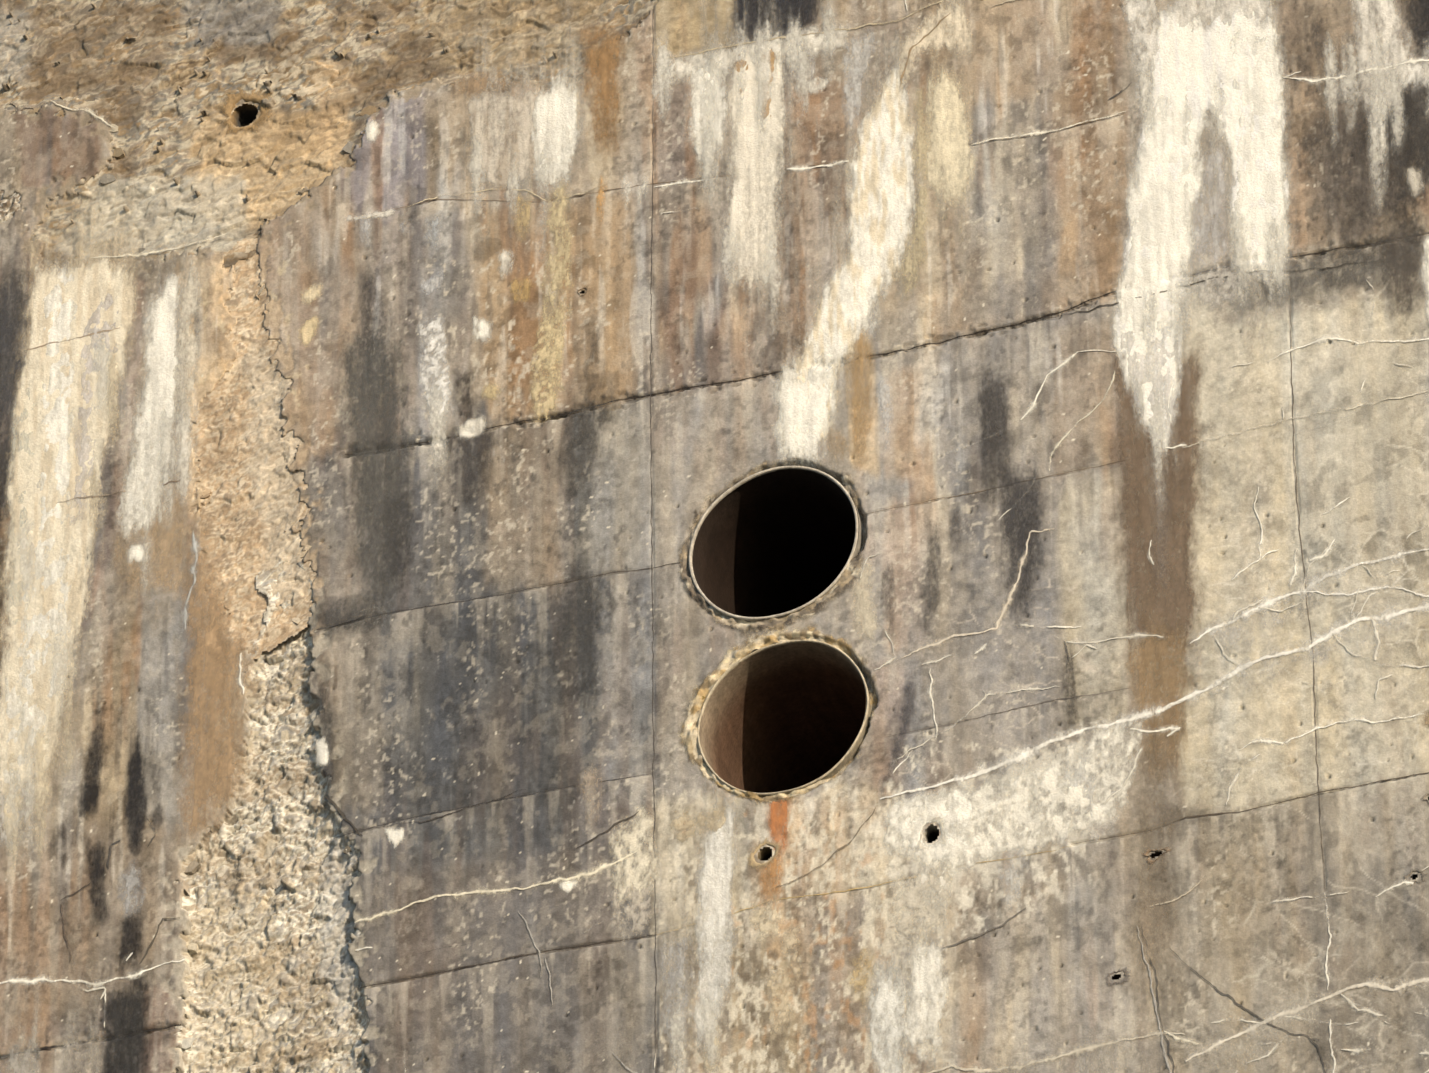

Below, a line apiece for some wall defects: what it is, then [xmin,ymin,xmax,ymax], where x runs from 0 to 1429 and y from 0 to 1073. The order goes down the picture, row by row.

damp [0,214,199,852]
spalling [0,0,658,1073]
crack [355,811,639,1005]
rust [762,798,787,894]
efflorescence [652,2,973,467]
damp [850,721,1141,1073]
crack [1021,350,1121,471]
crack [769,487,1429,891]
crack [926,866,1429,1073]
efflorescence [1113,0,1289,473]
crack [1048,261,1429,449]
damp [1324,0,1429,208]